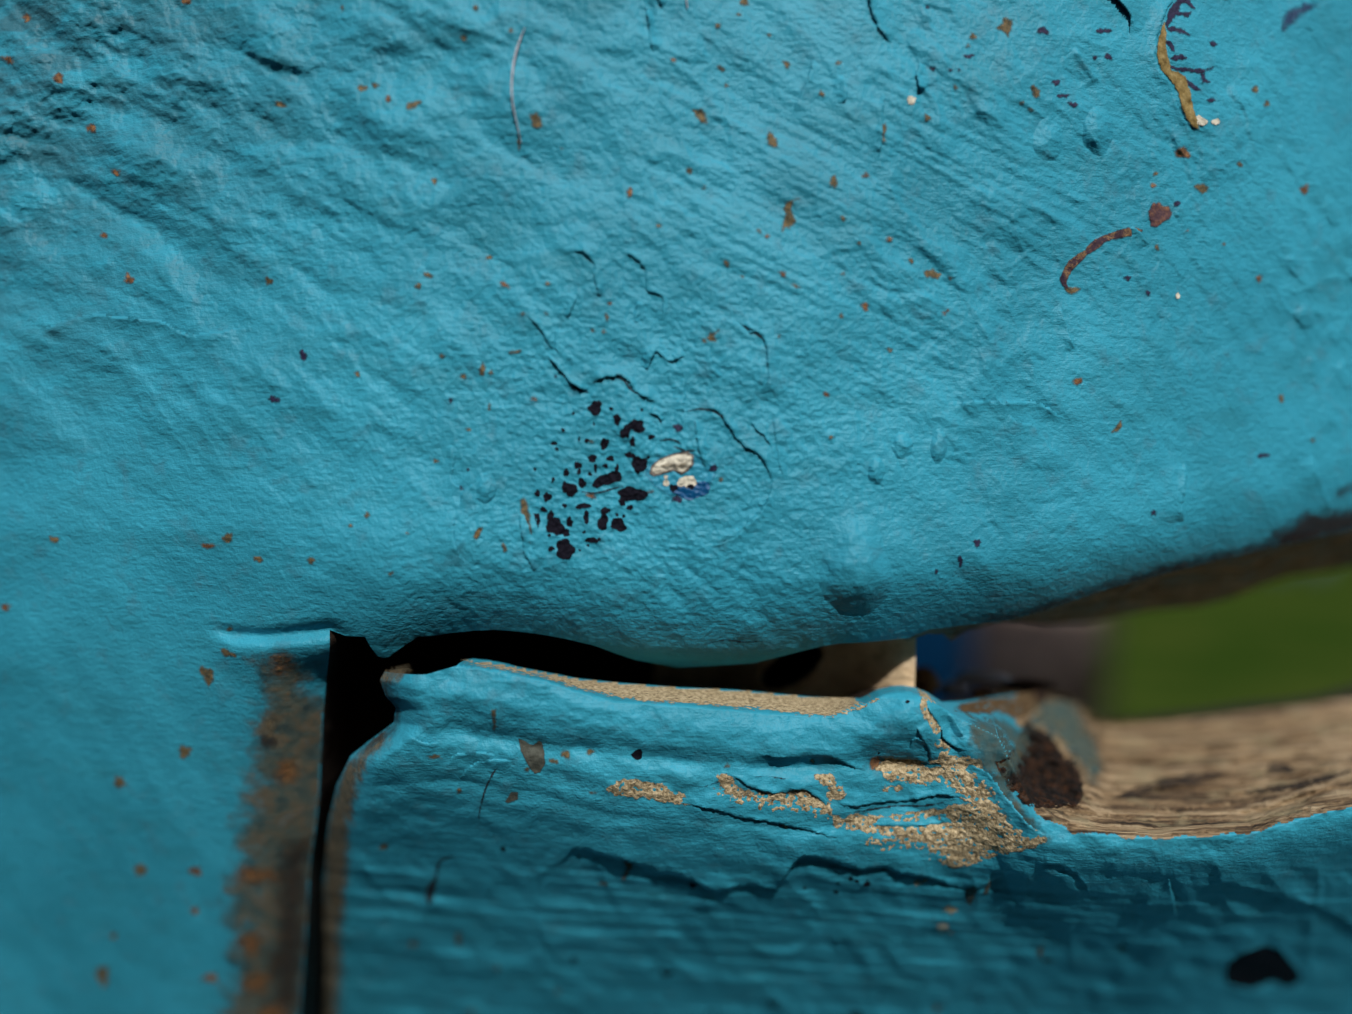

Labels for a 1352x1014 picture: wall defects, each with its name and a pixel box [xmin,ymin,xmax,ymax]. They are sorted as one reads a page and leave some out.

corrosion [1176,147,1191,158]
peeling [519,235,796,571]
corrosion [225,654,403,1014]
peeling [389,724,545,783]
spalling [464,659,879,717]
peeling [543,689,1113,896]